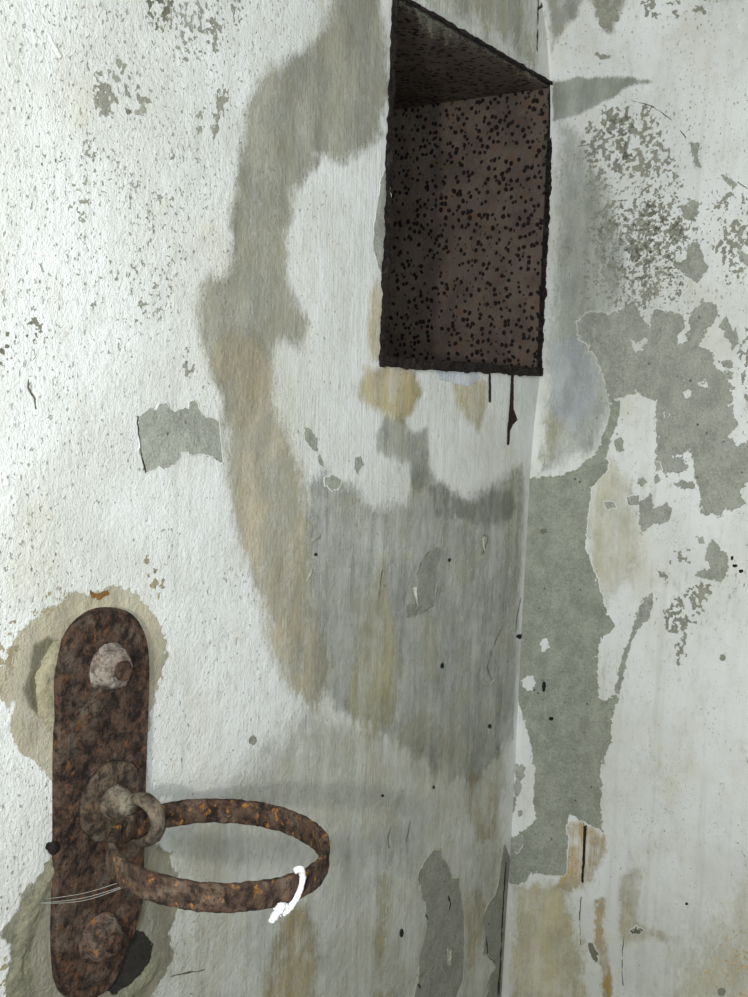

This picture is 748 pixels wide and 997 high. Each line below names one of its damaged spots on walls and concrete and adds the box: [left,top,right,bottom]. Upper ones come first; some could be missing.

peeling [145,0,251,70]
crack [536,0,544,52]
water stain [549,0,578,37]
water stain [201,0,389,406]
peeling [137,399,224,474]
peeling [482,101,748,997]
water stain [306,417,522,782]
water stain [26,638,53,712]
rust [1,876,39,971]
rust [30,891,65,997]
rust [136,900,177,997]
spalling [412,847,465,997]